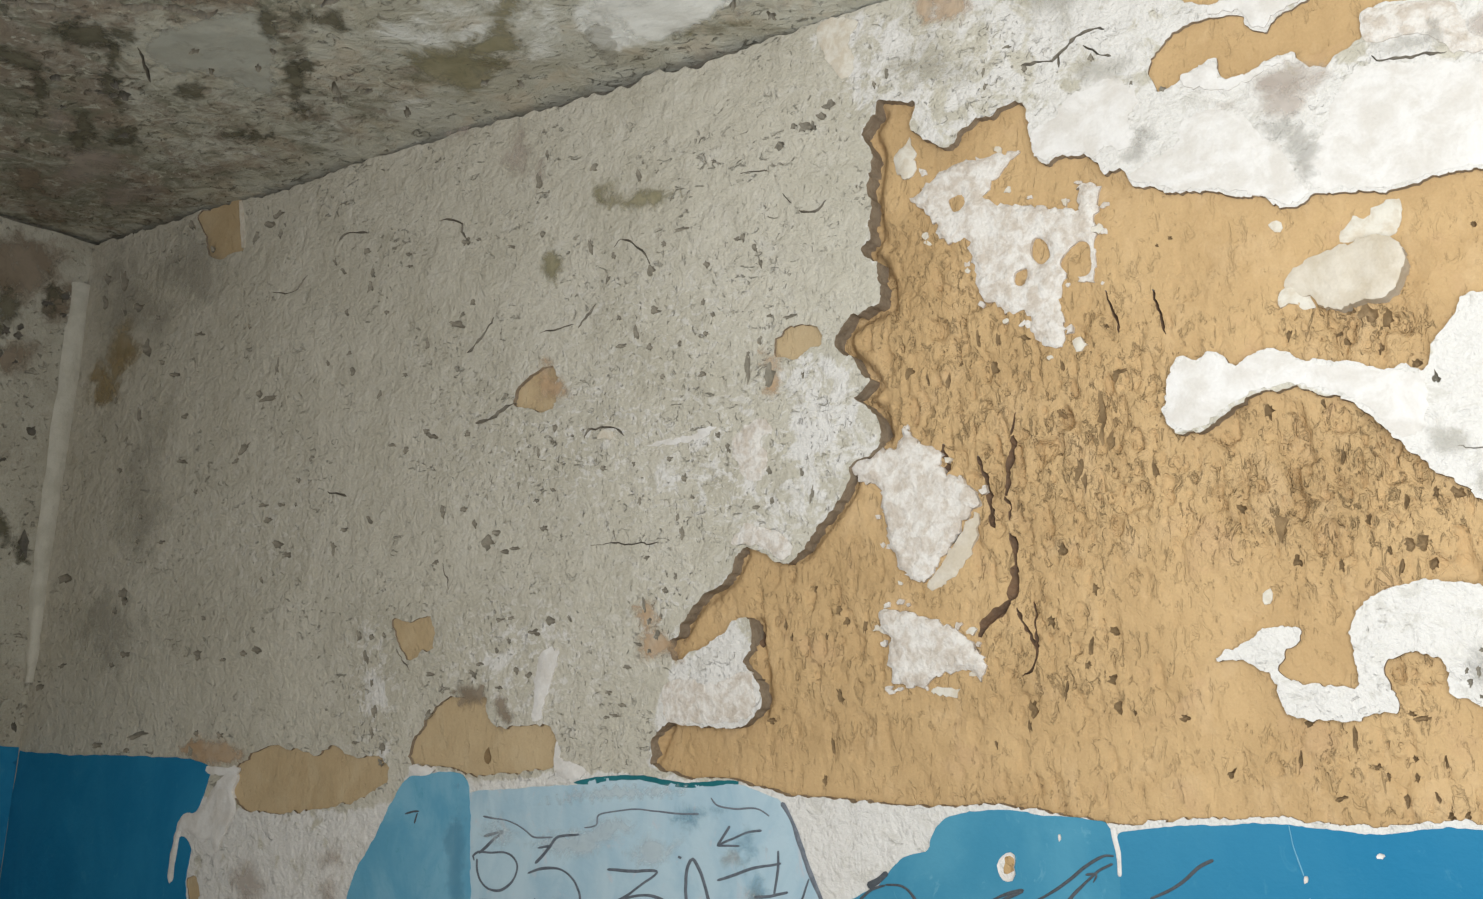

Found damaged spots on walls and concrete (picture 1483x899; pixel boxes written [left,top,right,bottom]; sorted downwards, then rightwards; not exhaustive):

leakage [53,18,141,152]
leakage [172,0,350,40]
leakage [282,60,313,118]
leakage [407,0,522,92]
spalling [1149,0,1405,92]
spalling [188,200,285,260]
leakage [0,232,72,373]
spalling [657,99,1483,828]
crack [941,412,1040,676]
spalling [356,616,435,687]
spalling [411,685,556,777]
spalling [167,705,389,899]